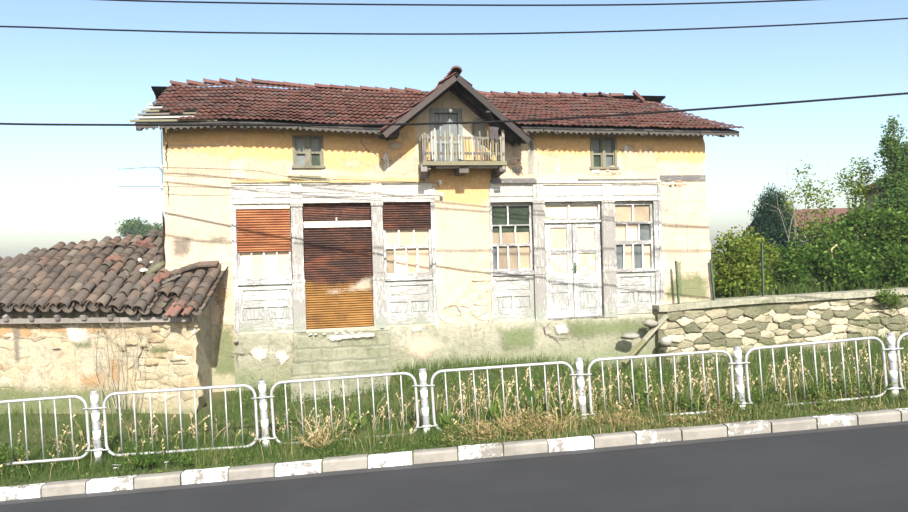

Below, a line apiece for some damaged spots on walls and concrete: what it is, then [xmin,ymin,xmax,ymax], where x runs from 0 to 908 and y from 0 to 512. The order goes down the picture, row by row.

crack [163,133,171,201]
damp [162,231,189,259]
spalling [438,255,492,325]